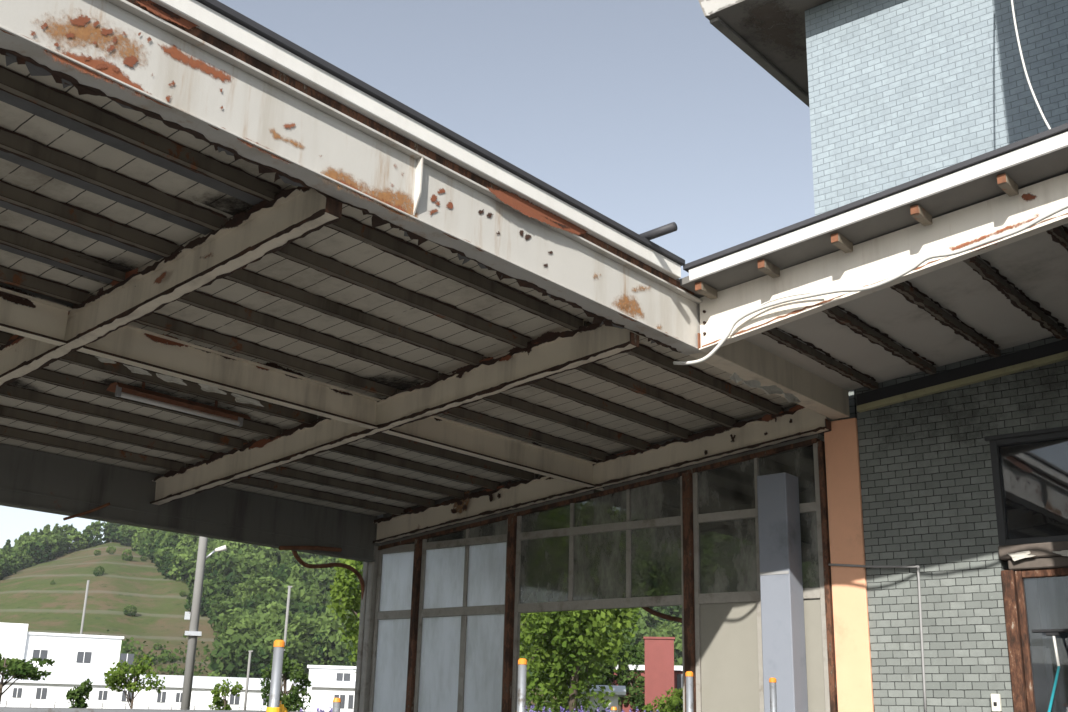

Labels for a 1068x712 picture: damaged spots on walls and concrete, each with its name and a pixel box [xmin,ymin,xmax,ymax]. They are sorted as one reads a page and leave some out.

corrosion [136,0,198,29]
peeling [0,49,100,96]
corrosion [30,15,231,99]
peeling [209,143,305,187]
peeling [362,211,428,246]
corrosion [0,65,825,543]
peeling [450,250,626,329]